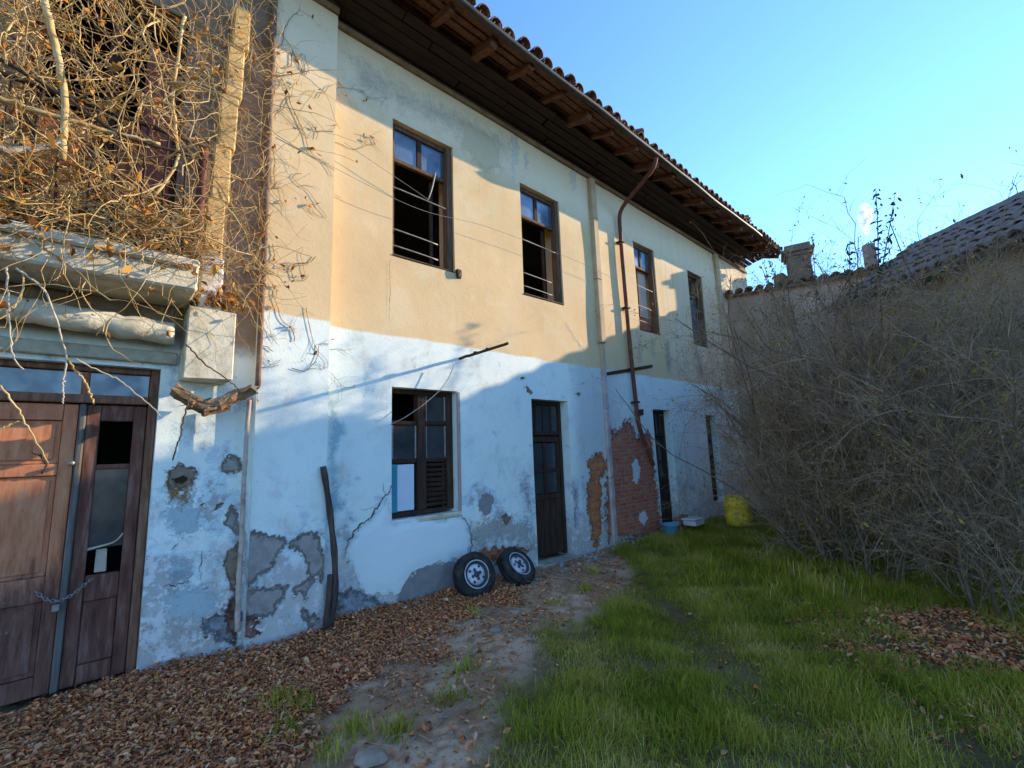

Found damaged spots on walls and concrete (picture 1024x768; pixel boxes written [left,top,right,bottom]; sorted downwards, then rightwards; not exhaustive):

spalling [218,454,243,475]
spalling [161,461,325,645]
crack [345,483,392,552]
flaking render [586,417,663,550]